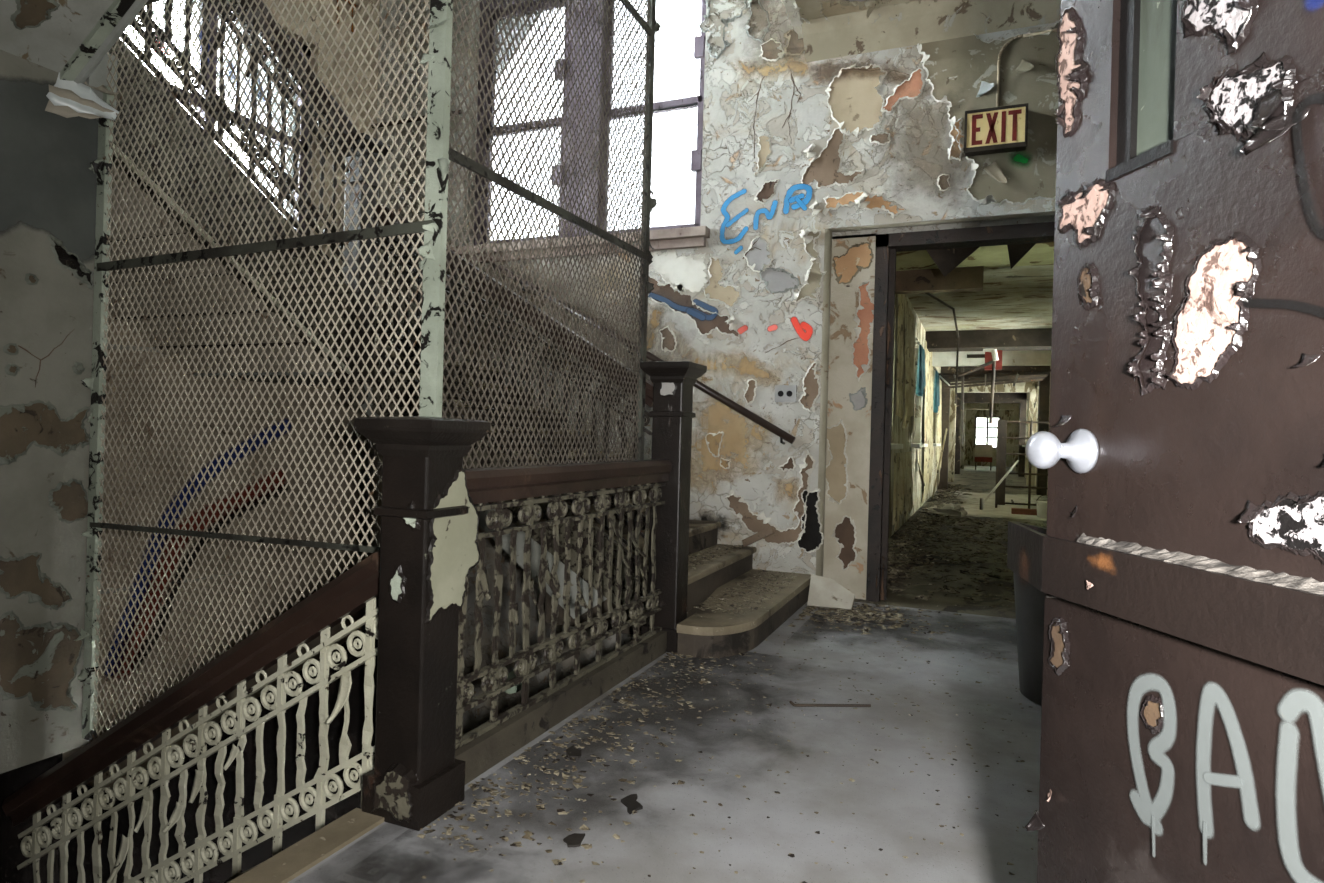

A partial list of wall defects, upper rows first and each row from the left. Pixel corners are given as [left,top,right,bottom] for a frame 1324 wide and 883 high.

peeling [699,0,938,62]
peeling [1180,0,1311,155]
peeling [644,240,741,352]
peeling [724,7,1115,571]
peeling [1126,205,1262,396]
peeling [659,381,677,398]
peeling [705,431,731,469]
peeling [388,565,407,604]
peeling [402,466,481,624]
peeling [1237,491,1324,565]